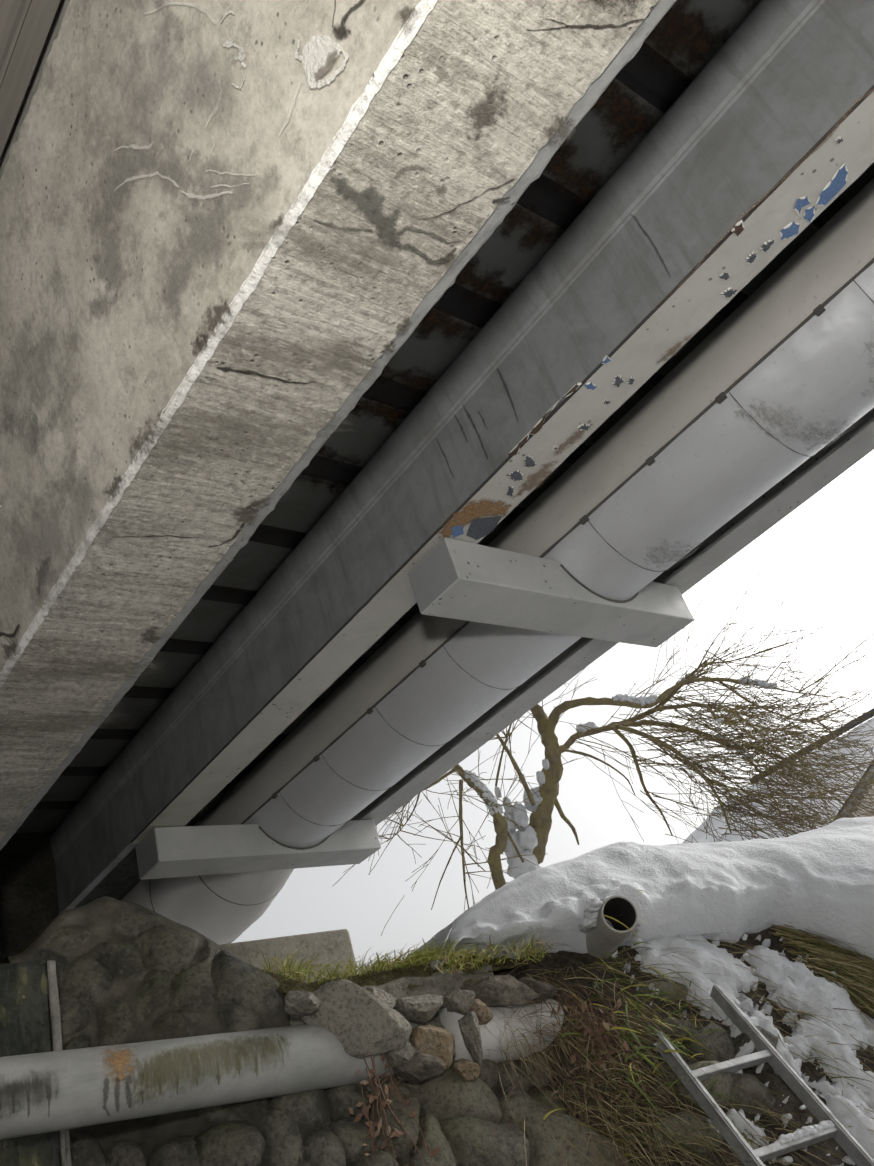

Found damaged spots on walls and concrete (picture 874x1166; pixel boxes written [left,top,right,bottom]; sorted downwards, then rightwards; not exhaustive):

spalling [279,0,364,136]
crack [528,18,644,31]
corrosion [644,0,728,83]
corrosion [590,76,654,152]
corrosion [544,140,601,207]
crack [314,177,514,265]
corrosion [502,206,568,249]
peeling [731,220,745,236]
peeling [746,163,848,264]
crack [217,367,316,384]
damp [0,1074,58,1117]
damp [134,1037,284,1103]